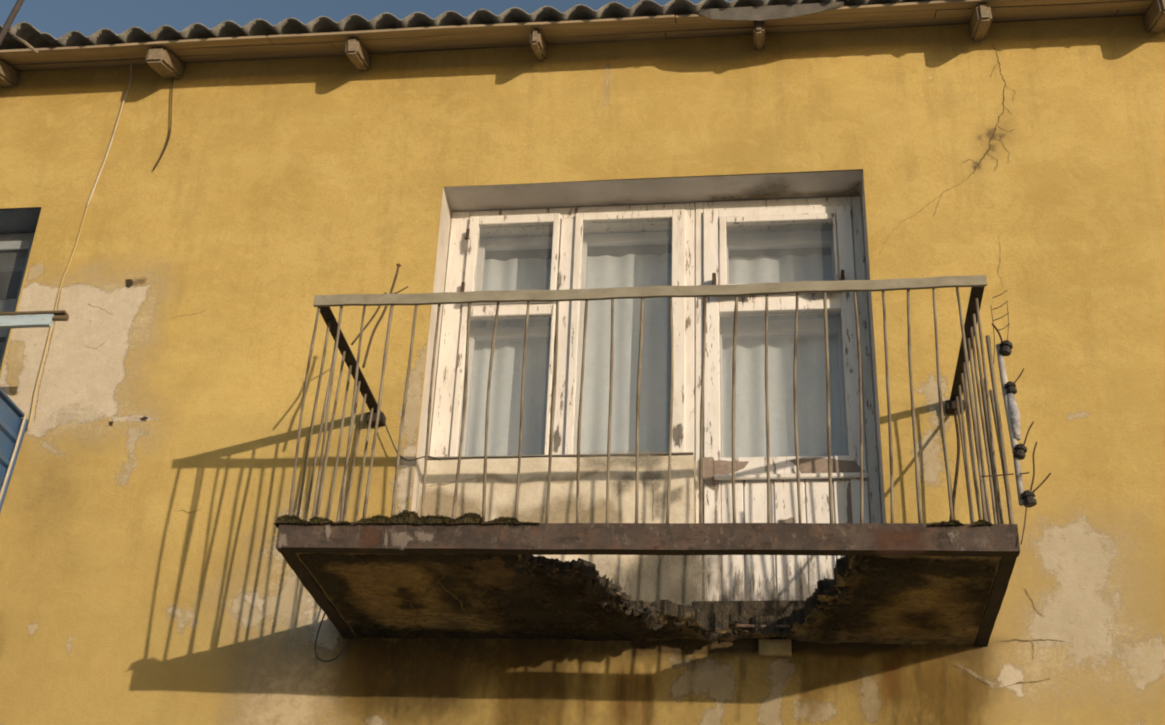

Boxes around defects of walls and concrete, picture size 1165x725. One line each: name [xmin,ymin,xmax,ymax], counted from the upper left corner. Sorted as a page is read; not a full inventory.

crack [879,44,1015,254]
peeling [0,263,158,486]
peeling [673,423,682,447]
damp [418,491,482,519]
damp [500,499,617,523]
damp [617,453,680,515]
peeling [703,457,748,523]
peeling [790,457,867,523]
peeling [229,502,340,664]
spalling [504,555,868,641]
peeling [996,516,1165,699]
peeling [758,657,837,725]